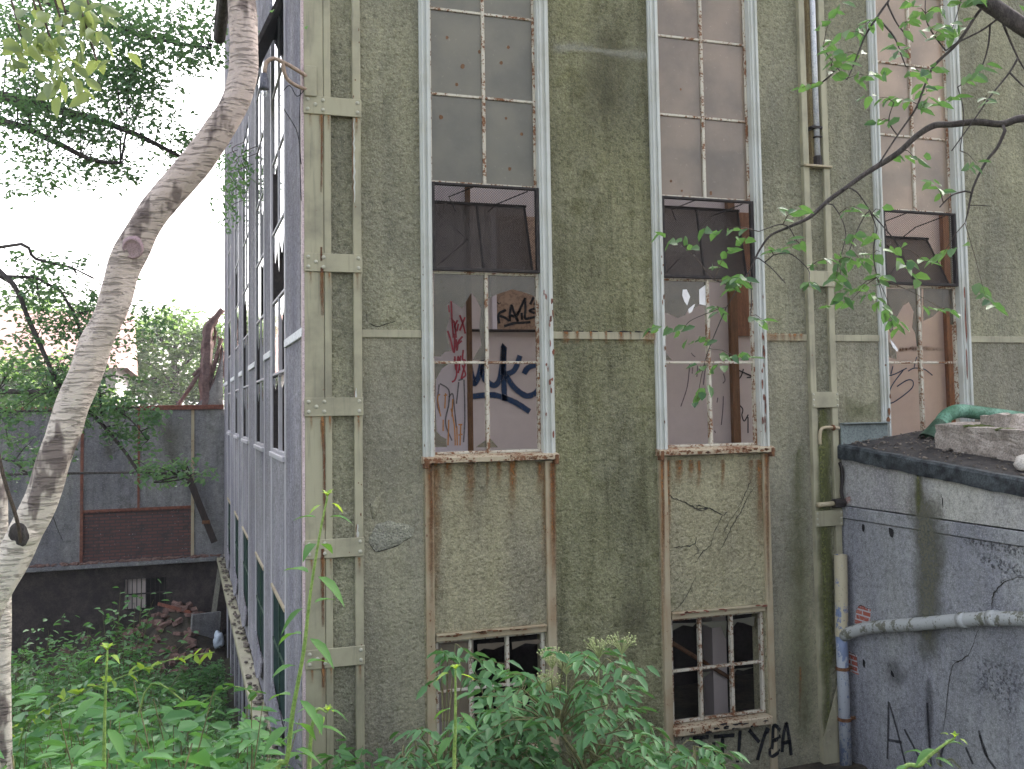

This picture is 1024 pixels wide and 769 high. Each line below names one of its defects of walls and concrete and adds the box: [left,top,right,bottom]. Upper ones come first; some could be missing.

corrosion [309,114,329,188]
corrosion [310,247,330,314]
corrosion [310,416,331,526]
corrosion [486,460,516,487]
corrosion [749,454,769,522]
crack [670,480,755,612]
damp [914,475,944,617]
corrosion [311,549,331,625]
flaking render [855,605,871,624]
damp [919,630,935,651]
crack [943,631,978,727]